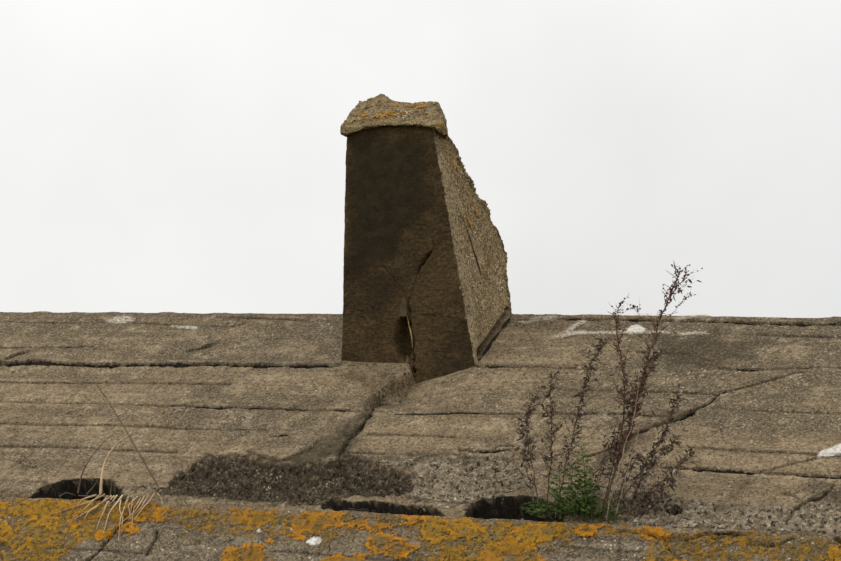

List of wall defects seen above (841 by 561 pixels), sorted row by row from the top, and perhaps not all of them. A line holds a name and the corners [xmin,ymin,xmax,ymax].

crack [382,241,437,377]
crack [0,347,333,369]
leakage [818,444,841,457]
spalling [162,432,532,511]
crack [693,468,755,476]